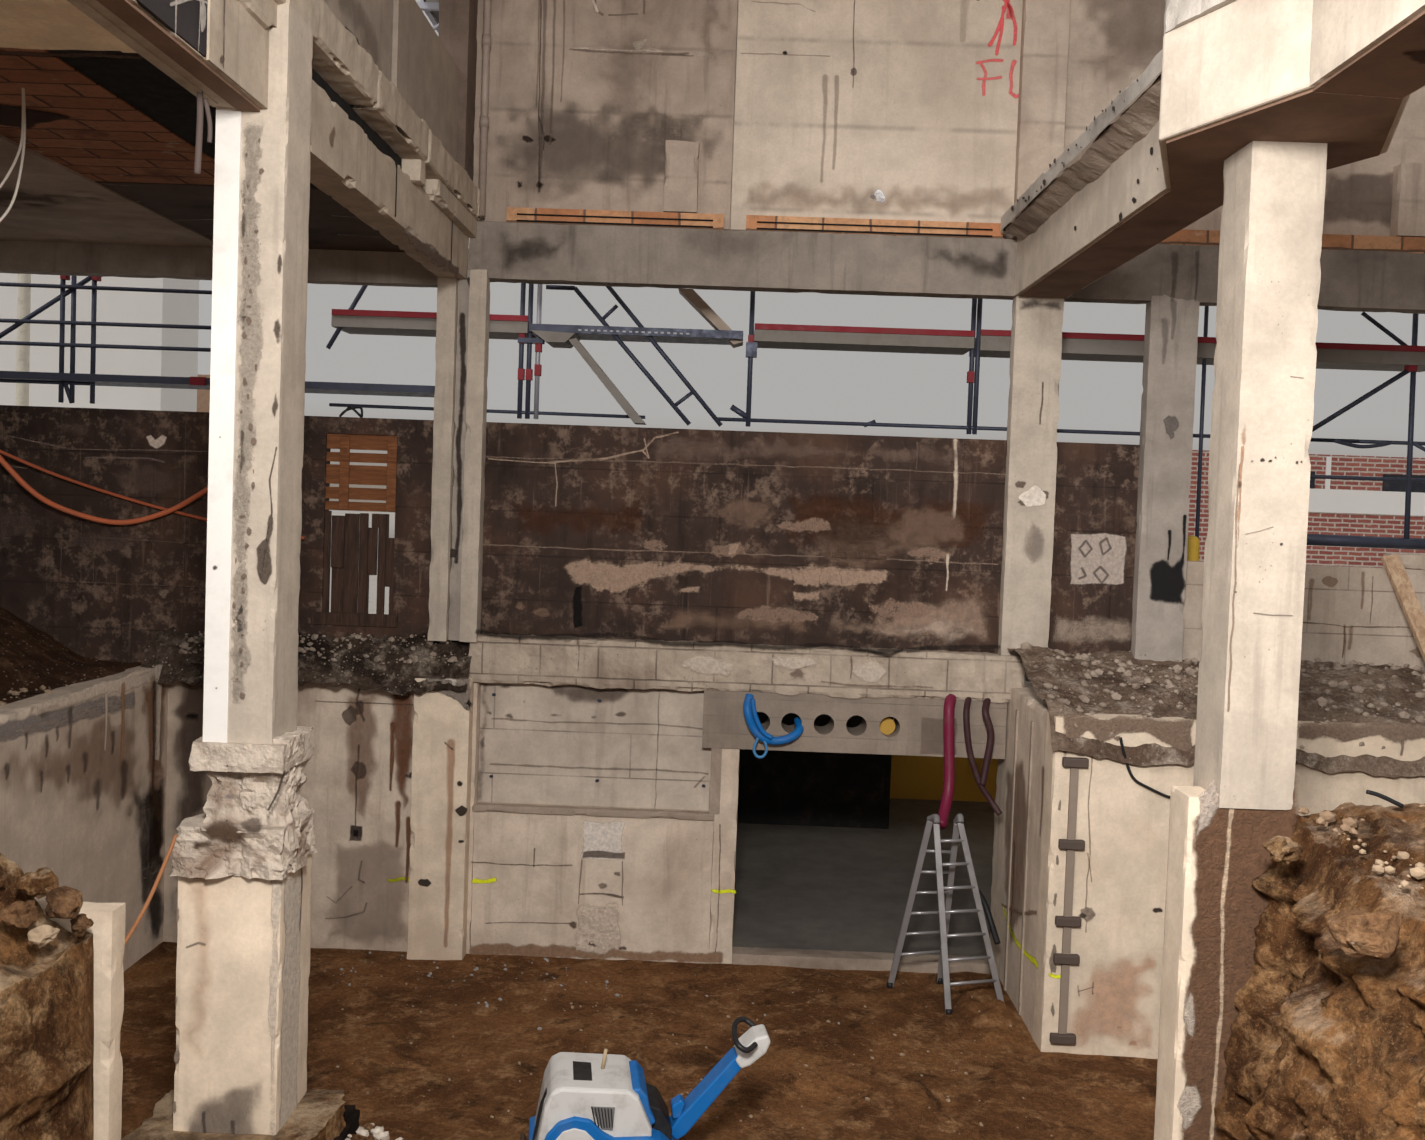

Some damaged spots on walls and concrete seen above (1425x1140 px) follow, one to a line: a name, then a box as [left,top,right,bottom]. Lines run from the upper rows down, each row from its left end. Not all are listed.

spalling [216,126,280,700]
peeling [778,518,830,532]
peeling [908,546,951,564]
peeling [565,540,891,623]
peeling [869,598,936,619]
water stain [350,699,374,806]
spalling [350,825,362,841]